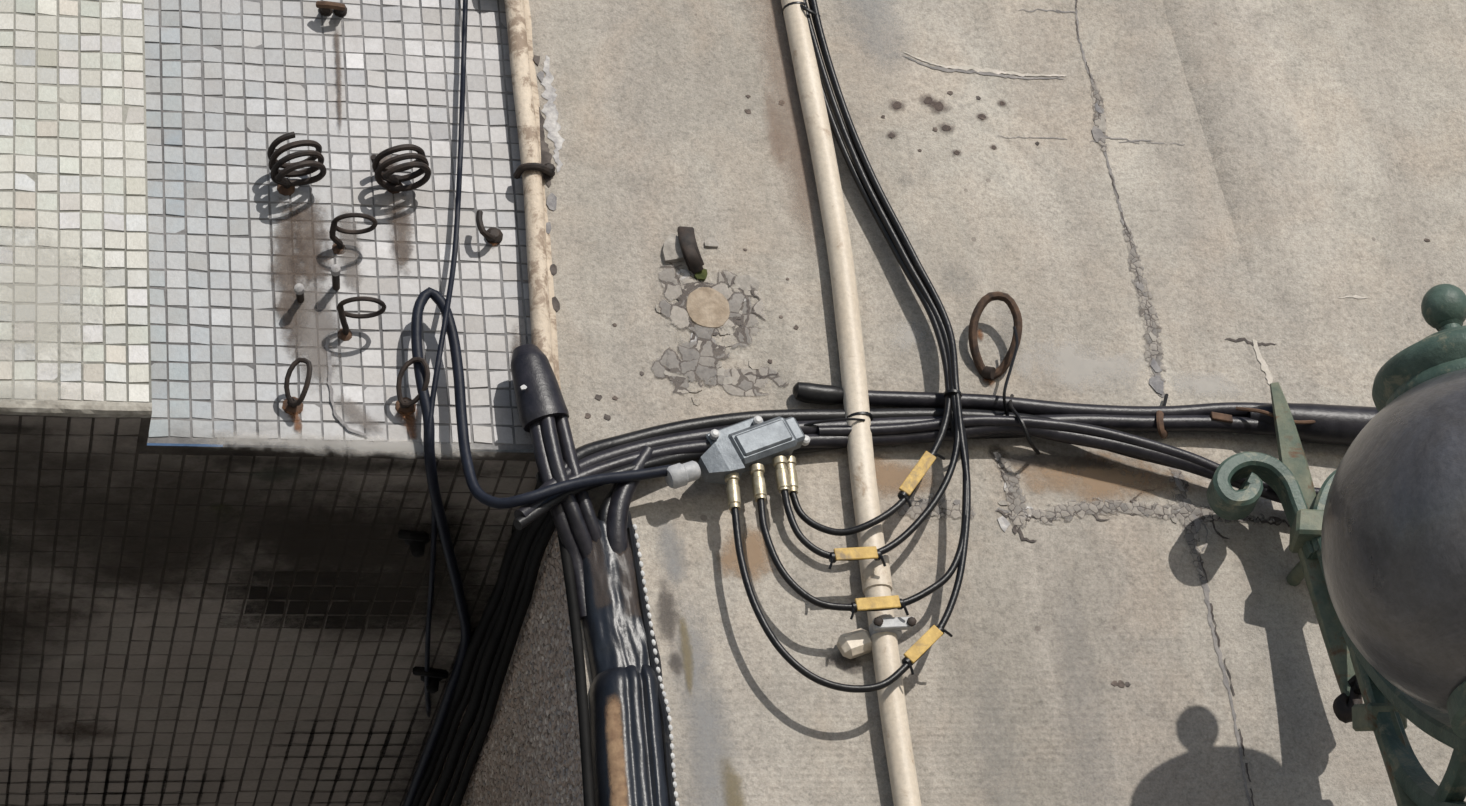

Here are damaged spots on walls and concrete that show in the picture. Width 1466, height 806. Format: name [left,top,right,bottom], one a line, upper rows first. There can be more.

crack [998,0,1185,398]
corrosion [271,205,330,344]
flaking render [640,262,799,406]
corrosion [285,408,301,432]
leakage [341,397,377,429]
corrosion [398,409,416,439]
leakage [0,426,488,630]
crack [996,467,1290,806]